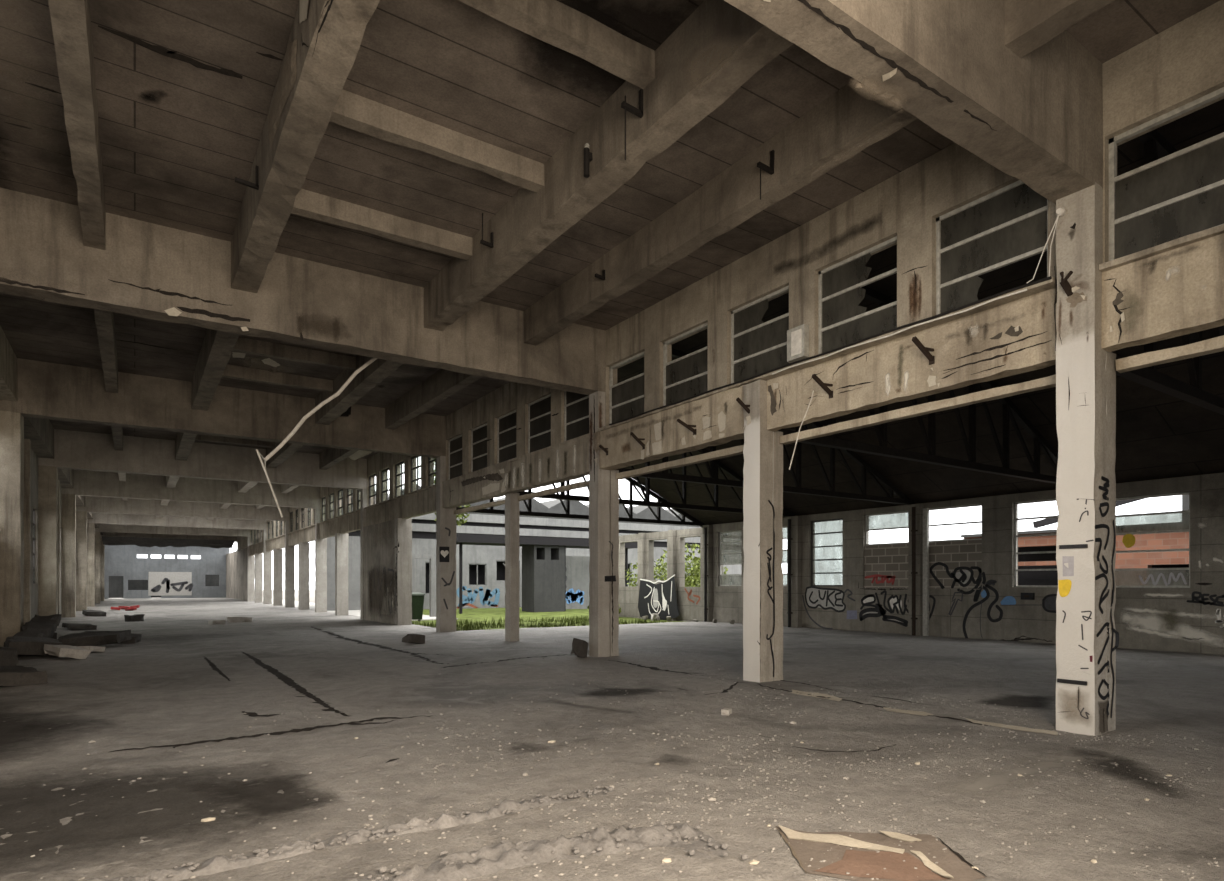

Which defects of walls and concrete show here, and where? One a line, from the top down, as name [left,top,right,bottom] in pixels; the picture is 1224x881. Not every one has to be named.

crack [98,0,333,79]
crack [798,0,997,131]
crack [1104,279,1130,343]
crack [110,711,434,752]
water stain [0,775,325,863]